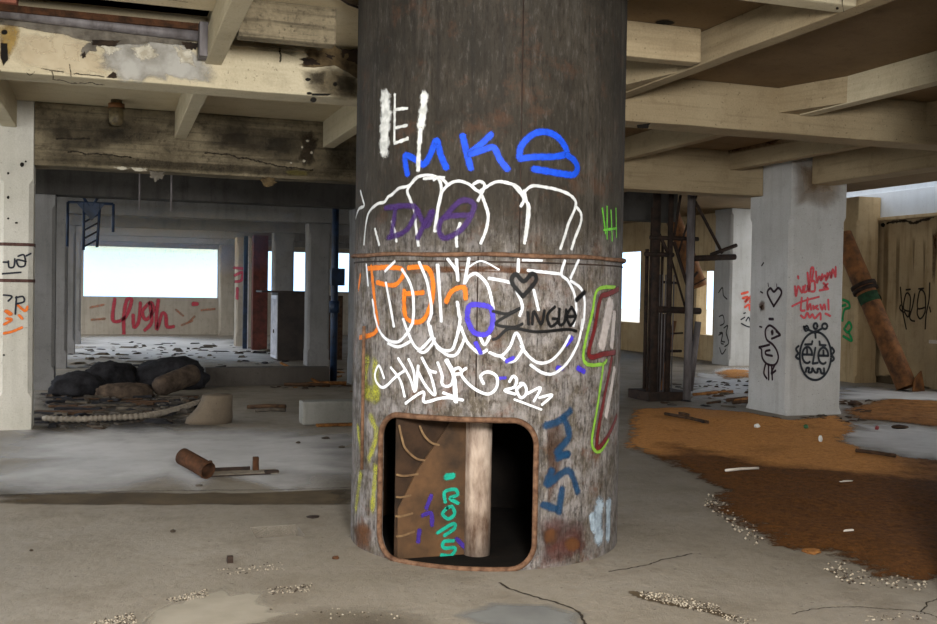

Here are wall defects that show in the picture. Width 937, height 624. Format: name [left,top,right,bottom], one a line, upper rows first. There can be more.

peeling [0,19,209,82]
spalling [300,46,358,78]
water stain [309,70,357,97]
crack [56,138,132,158]
water stain [94,158,297,175]
crack [205,152,313,171]
crack [499,582,587,624]
crack [856,599,937,617]